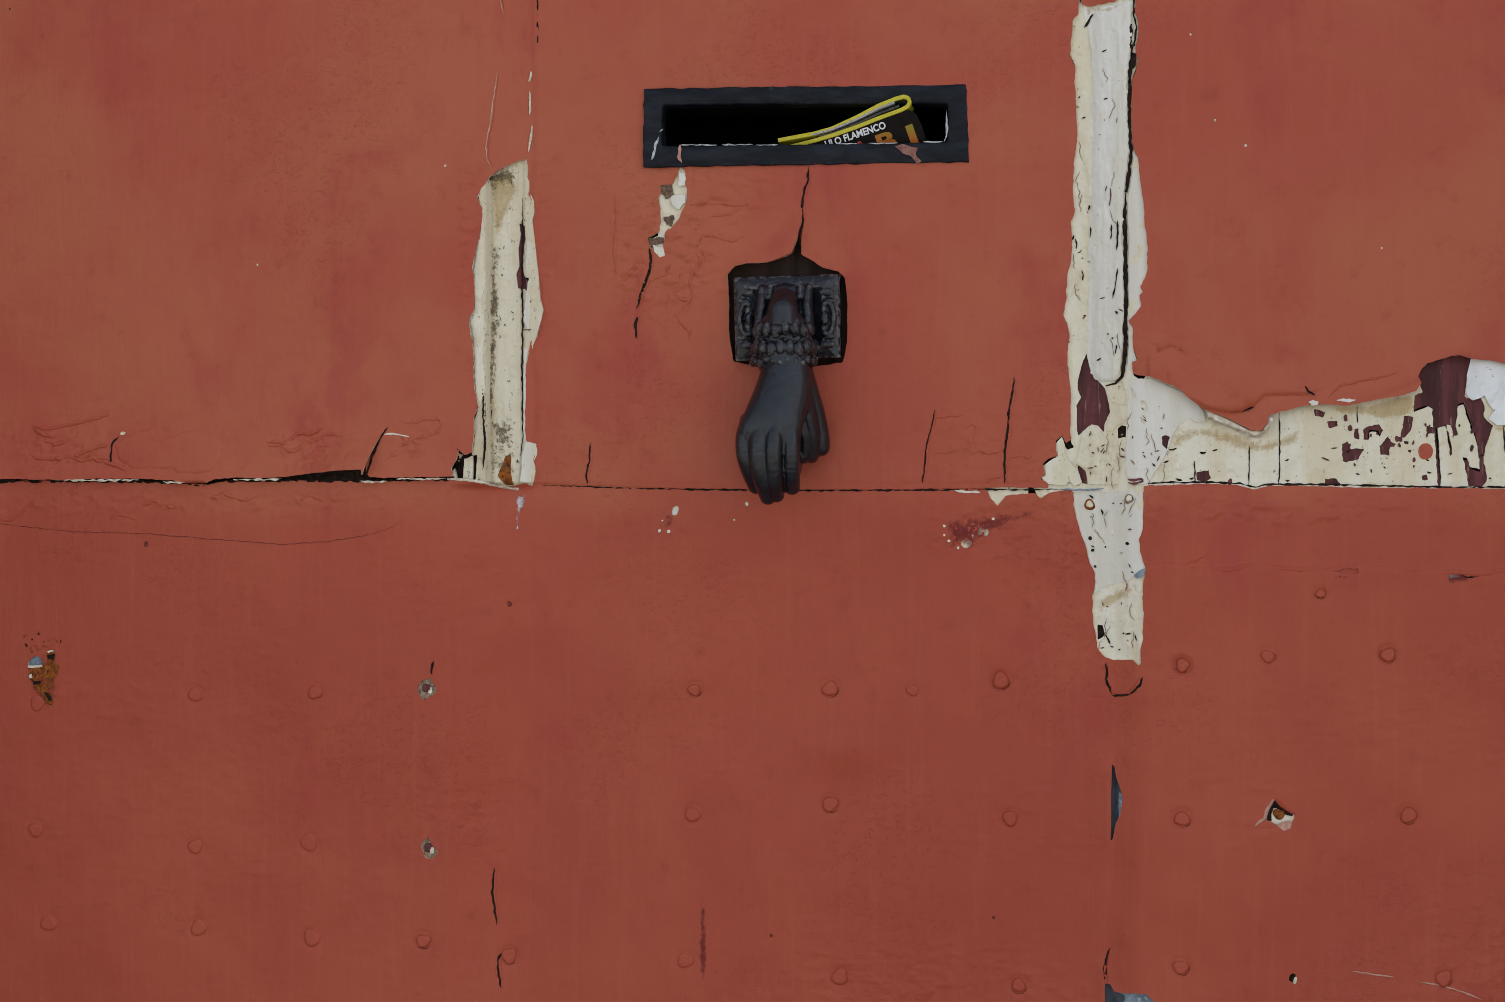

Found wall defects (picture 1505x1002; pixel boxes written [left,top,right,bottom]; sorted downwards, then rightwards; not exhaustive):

crack [1131,0,1139,46]
peeling [648,168,687,257]
peeling [721,206,802,282]
peeling [453,159,544,487]
peeling [943,0,1505,665]
crack [0,444,747,491]
crack [4,523,398,545]